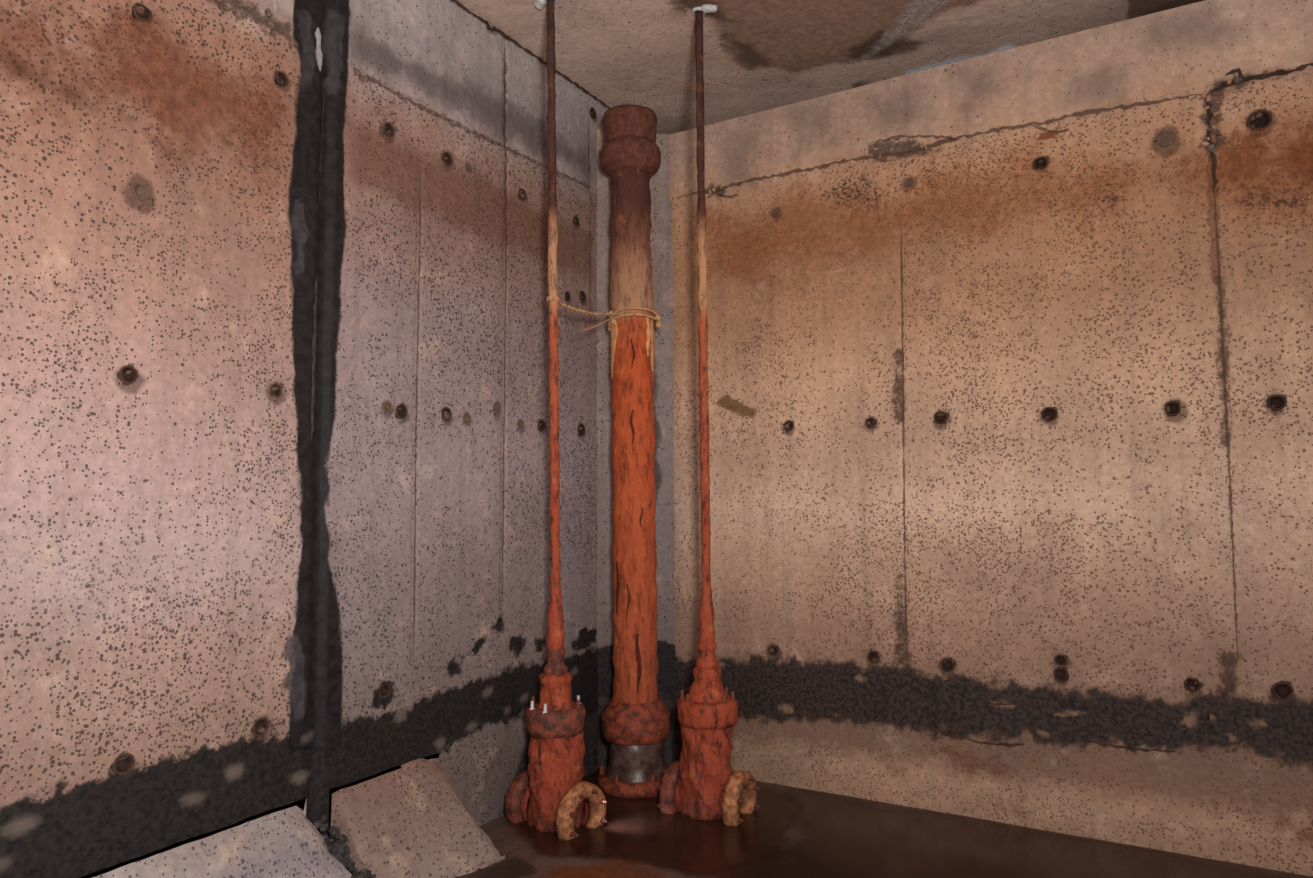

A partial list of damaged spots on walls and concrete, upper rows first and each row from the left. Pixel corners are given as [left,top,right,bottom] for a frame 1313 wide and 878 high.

damp [680,0,977,72]
crack [676,63,1313,694]